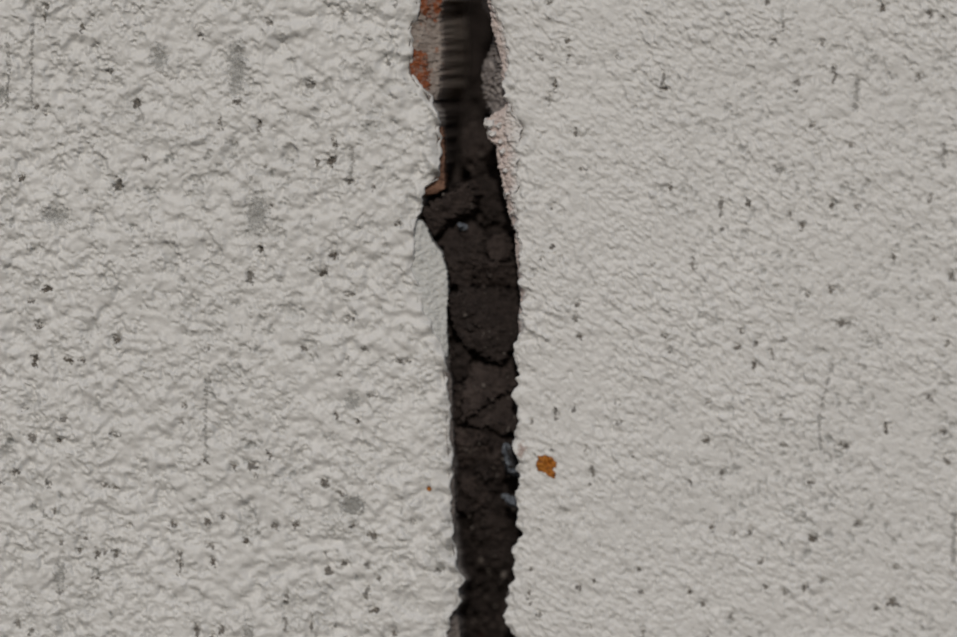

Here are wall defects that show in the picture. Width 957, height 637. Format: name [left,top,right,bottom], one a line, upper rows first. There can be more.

spalling [423,126,447,197]
spalling [410,0,468,100]
crack [408,0,524,637]
spalling [481,0,527,341]